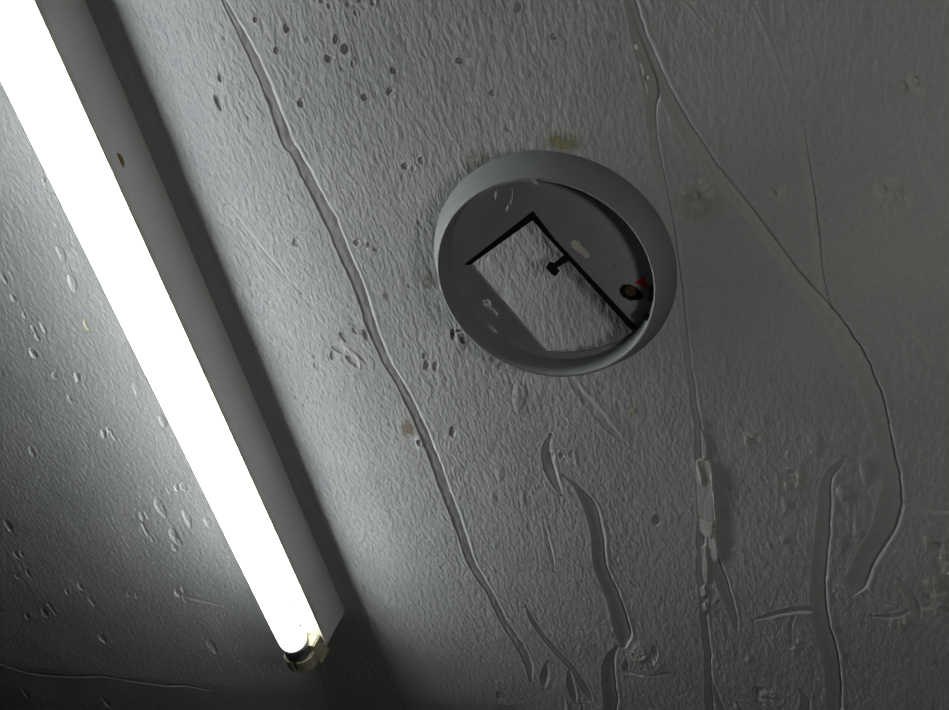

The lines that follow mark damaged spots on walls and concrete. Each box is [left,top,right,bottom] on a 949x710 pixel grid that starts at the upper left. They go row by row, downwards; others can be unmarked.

crack [219,0,635,710]
spalling [695,420,718,615]
crack [621,0,949,710]